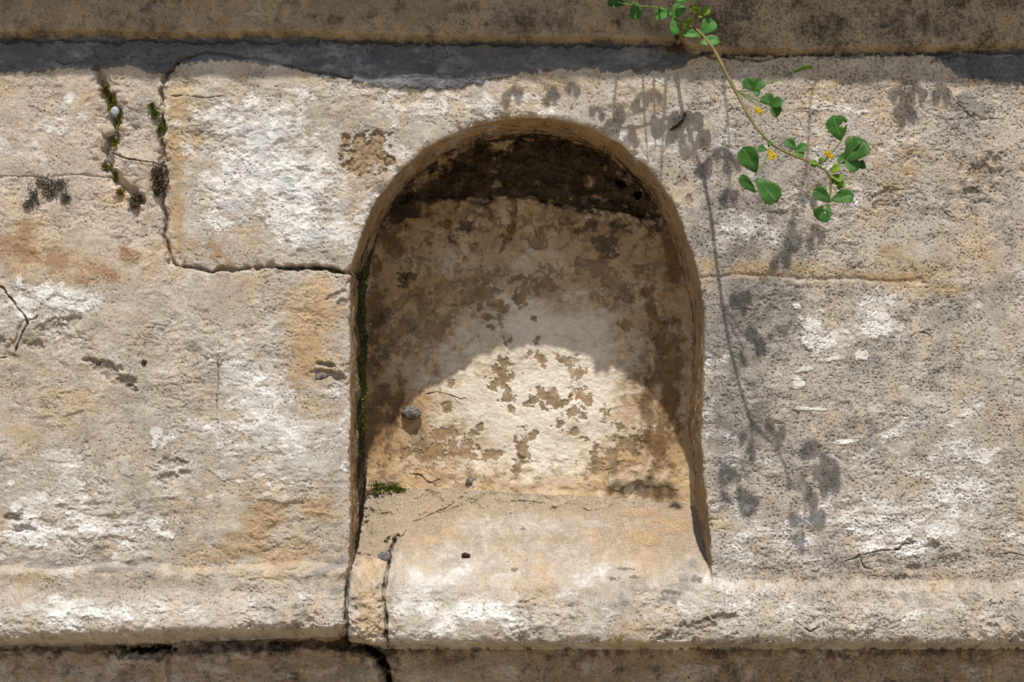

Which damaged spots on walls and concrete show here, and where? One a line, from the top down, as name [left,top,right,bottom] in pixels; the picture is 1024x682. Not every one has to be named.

spalling [339,129,396,179]
damp [594,199,646,217]
flaking render [396,234,646,475]
crack [382,474,451,640]